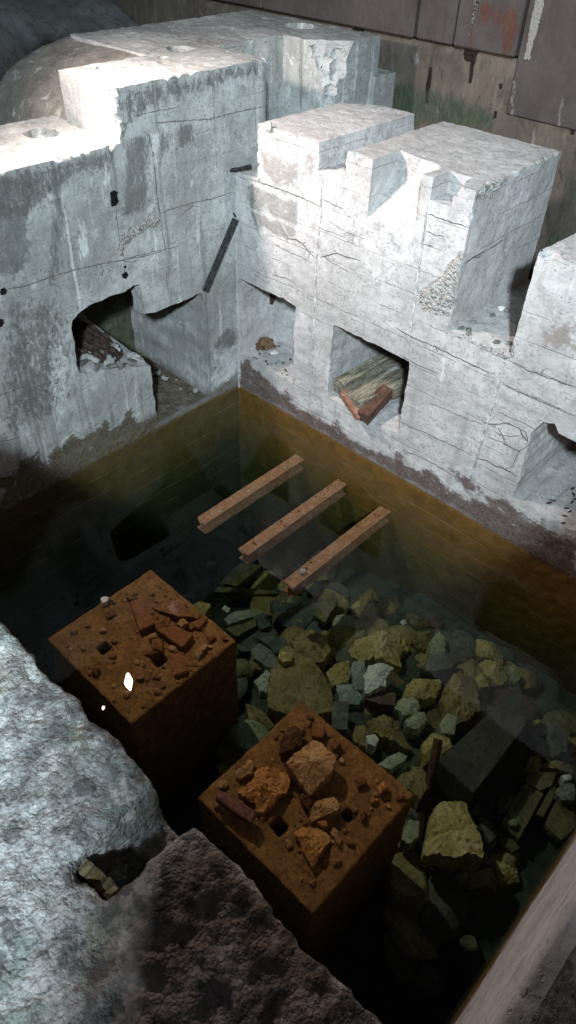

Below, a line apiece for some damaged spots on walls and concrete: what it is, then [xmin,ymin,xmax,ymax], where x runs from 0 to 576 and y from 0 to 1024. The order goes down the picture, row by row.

spalling [118,217,162,279]
spalling [419,251,463,316]
leakage [211,346,576,577]
crack [395,327,576,479]